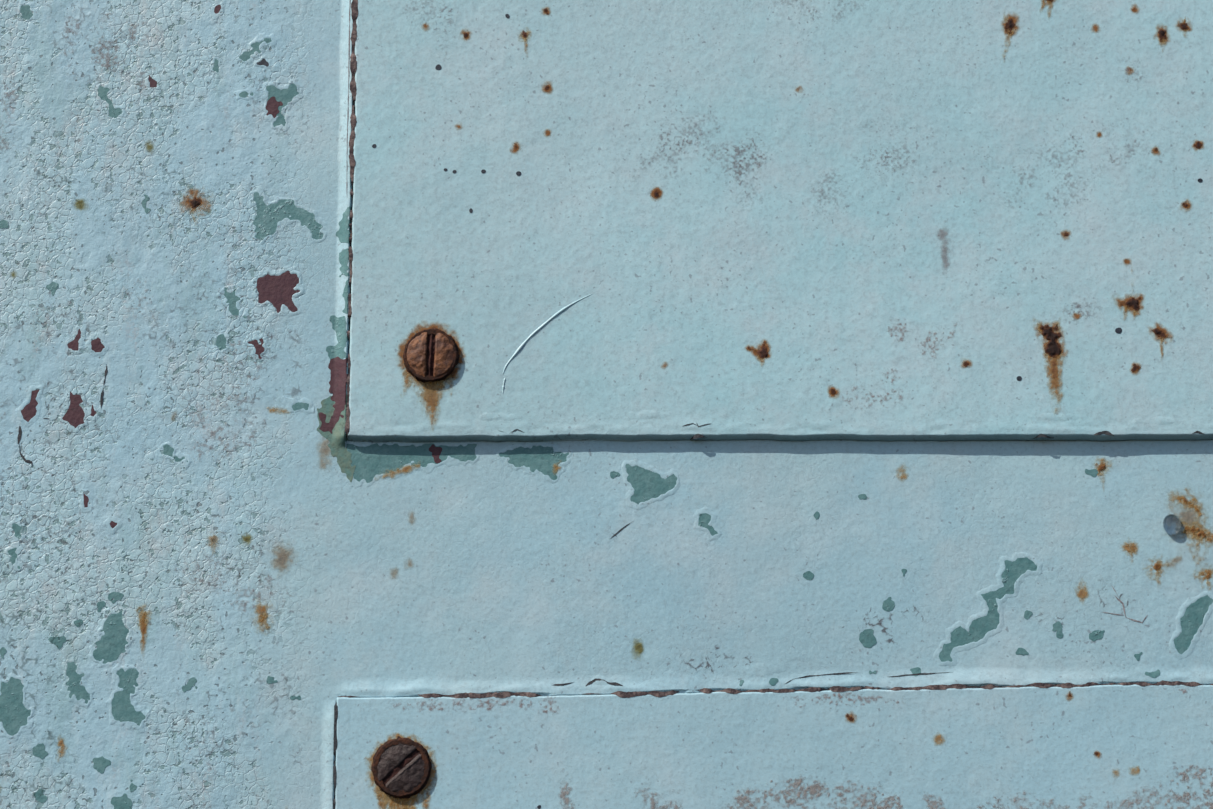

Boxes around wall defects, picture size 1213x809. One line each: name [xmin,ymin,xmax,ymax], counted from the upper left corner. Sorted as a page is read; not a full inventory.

peeling [212,265,305,362]
peeling [249,186,481,489]
corrosion [398,324,464,424]
corrosion [1037,323,1065,411]
peeling [496,436,572,484]
peeling [610,459,681,510]
corrosion [1172,490,1213,583]
peeling [933,552,1043,666]
peeling [1169,591,1213,660]
peeling [0,672,36,741]
peeling [32,743,48,759]
corrosion [368,734,436,809]